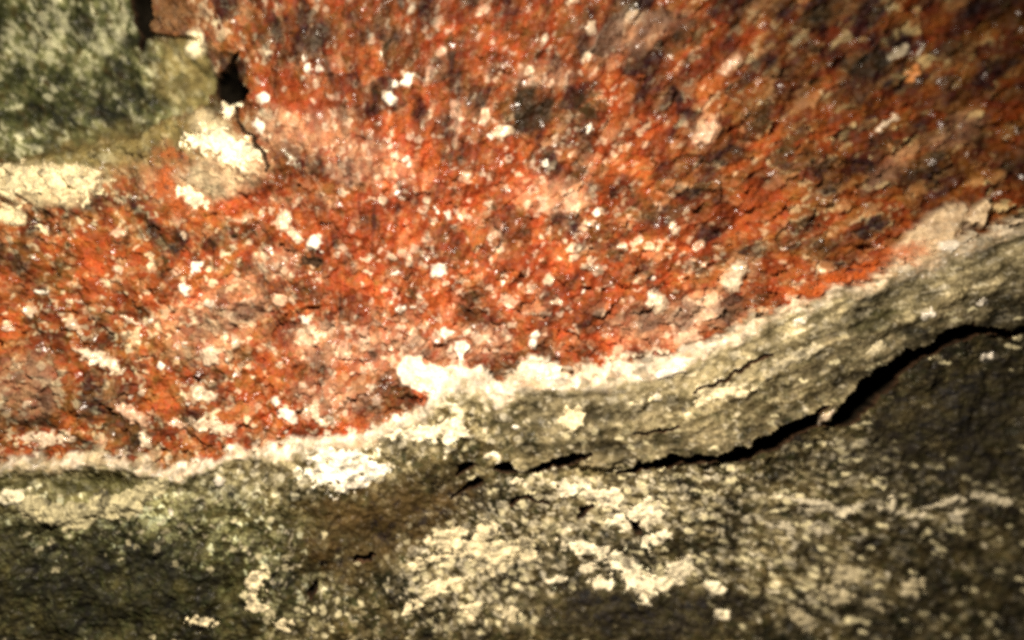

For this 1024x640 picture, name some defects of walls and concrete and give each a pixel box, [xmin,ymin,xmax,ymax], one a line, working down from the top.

rust [154,167,187,215]
rust [814,262,877,296]
crack [616,321,1024,475]